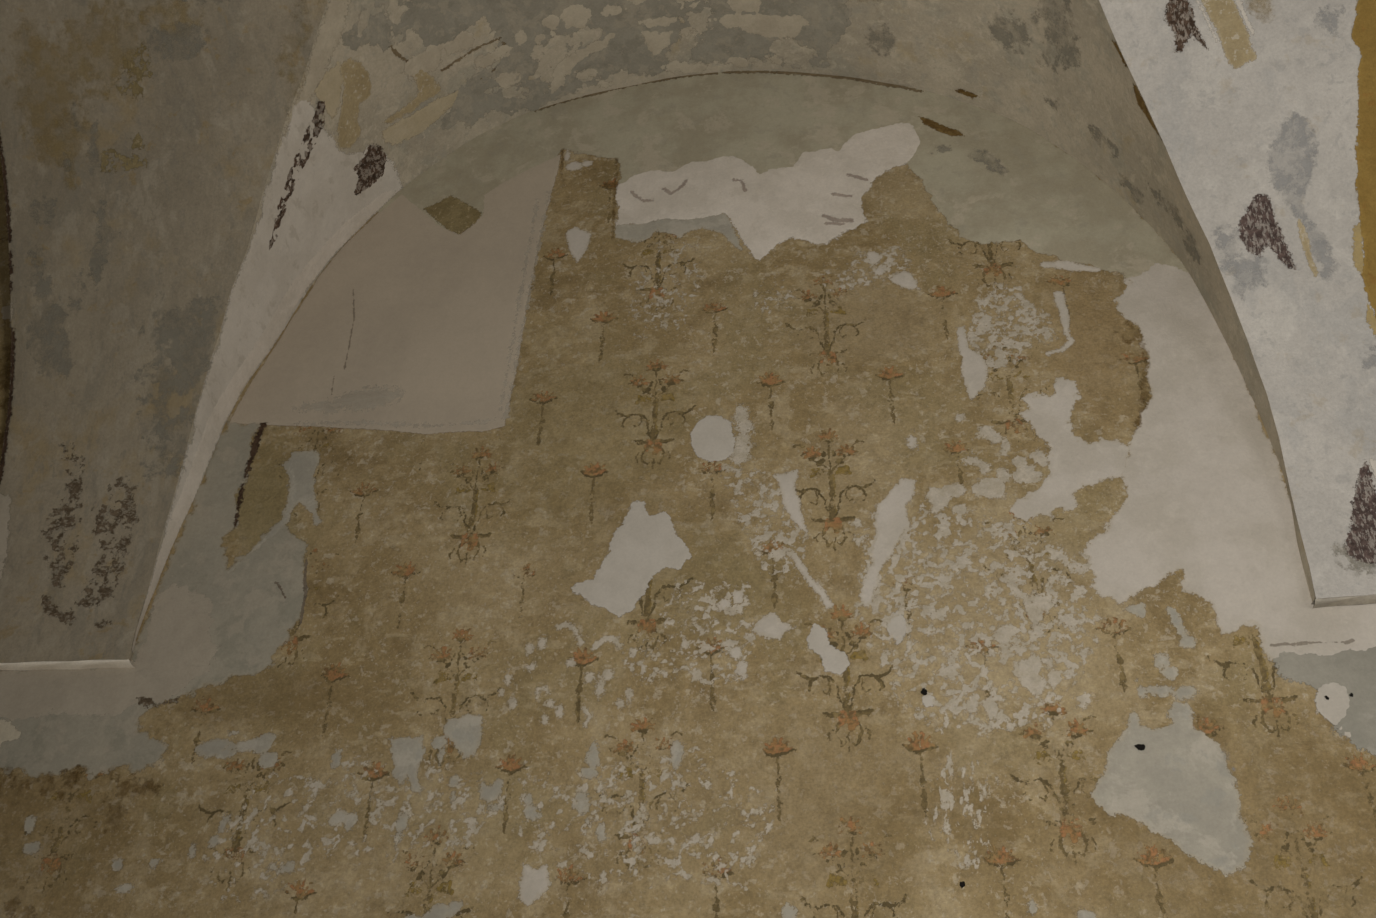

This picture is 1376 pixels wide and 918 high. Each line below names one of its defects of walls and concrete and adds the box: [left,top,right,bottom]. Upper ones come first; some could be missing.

leakage [989,0,1079,70]
spalling [41,443,140,628]
peeling [848,282,1130,869]
peeling [1125,602,1146,618]
peeling [187,404,850,906]
peeling [1133,606,1200,722]
spalling [136,696,180,709]
peeling [22,815,41,855]
peeling [405,900,463,918]